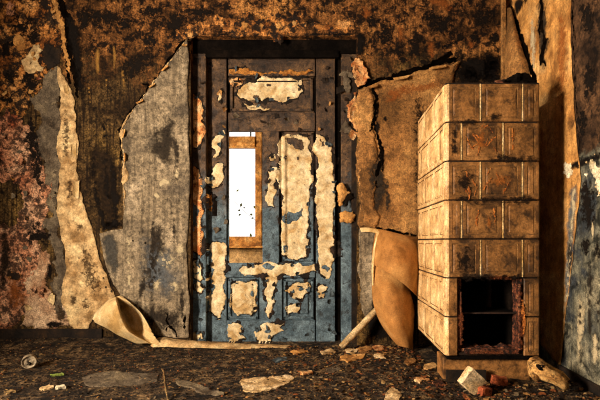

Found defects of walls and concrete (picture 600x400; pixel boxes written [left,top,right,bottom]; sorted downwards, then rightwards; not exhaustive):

damp [9,11,41,45]
damp [113,4,212,87]
damp [366,15,431,65]
peeling [193,92,207,148]
peeling [217,65,313,127]
peeling [321,56,370,140]
crack [358,50,458,188]
peeling [0,0,72,329]
damp [26,220,51,243]
peeling [193,125,356,344]
damp [563,177,600,310]
damp [577,266,600,363]